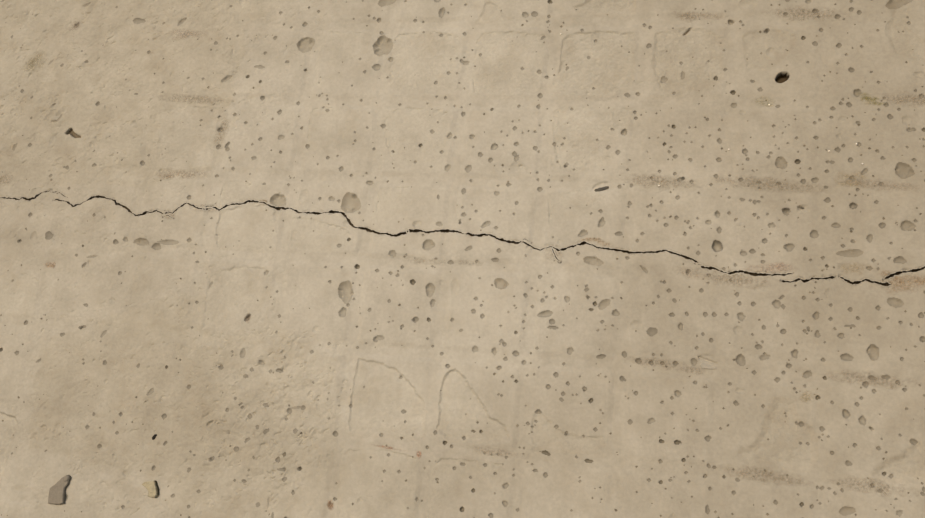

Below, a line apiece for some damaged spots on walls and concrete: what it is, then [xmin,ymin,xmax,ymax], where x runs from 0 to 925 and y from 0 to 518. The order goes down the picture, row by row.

crack [0,189,925,288]